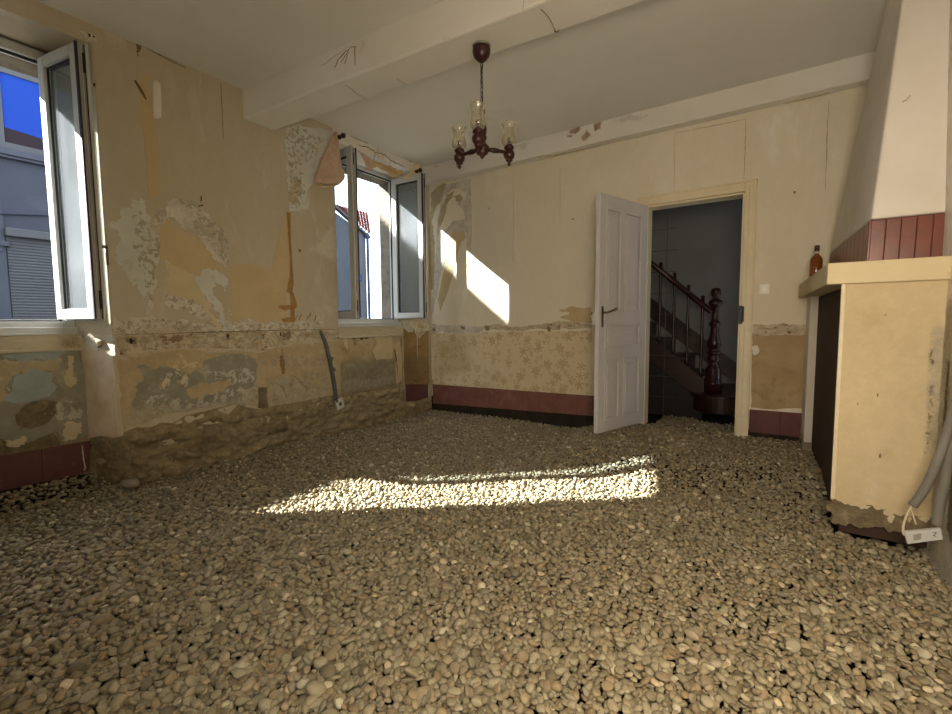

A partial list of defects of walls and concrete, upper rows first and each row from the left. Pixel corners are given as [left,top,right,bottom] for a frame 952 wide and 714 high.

peeling [567,122,602,142]
peeling [417,179,472,338]
peeling [0,73,333,487]
peeling [547,306,592,332]
spalling [825,498,931,532]